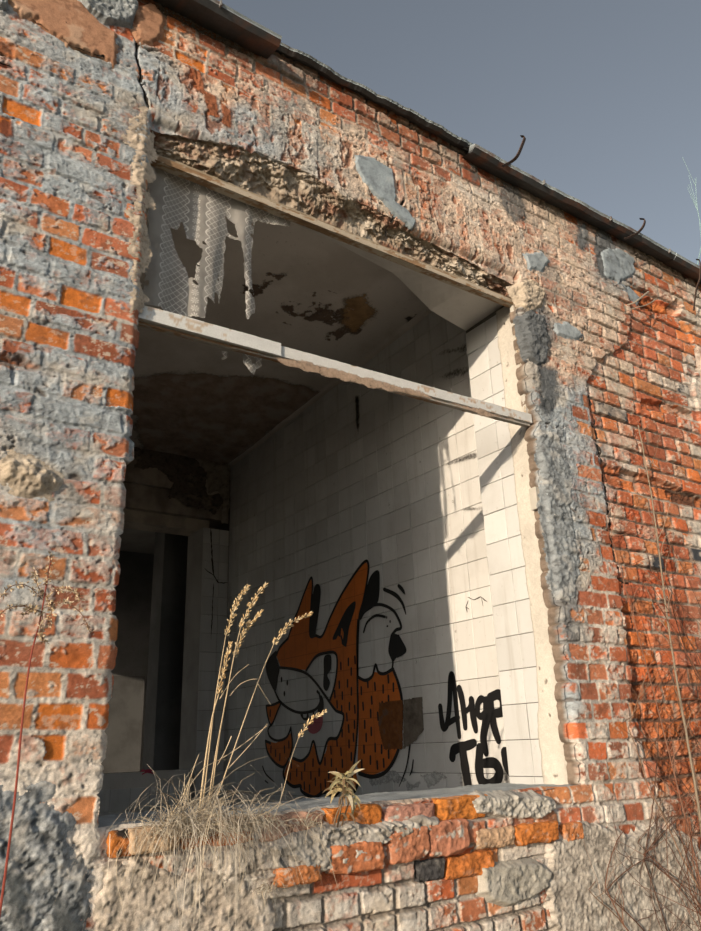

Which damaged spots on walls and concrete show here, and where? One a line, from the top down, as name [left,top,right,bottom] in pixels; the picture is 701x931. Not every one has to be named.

peeling [0,0,166,69]
crack [133,37,157,107]
peeling [354,155,416,231]
peeling [601,247,684,318]
peeling [553,321,584,341]
peeling [277,358,432,399]
peeling [452,403,513,420]
spalling [134,447,224,515]
spalling [106,794,584,888]